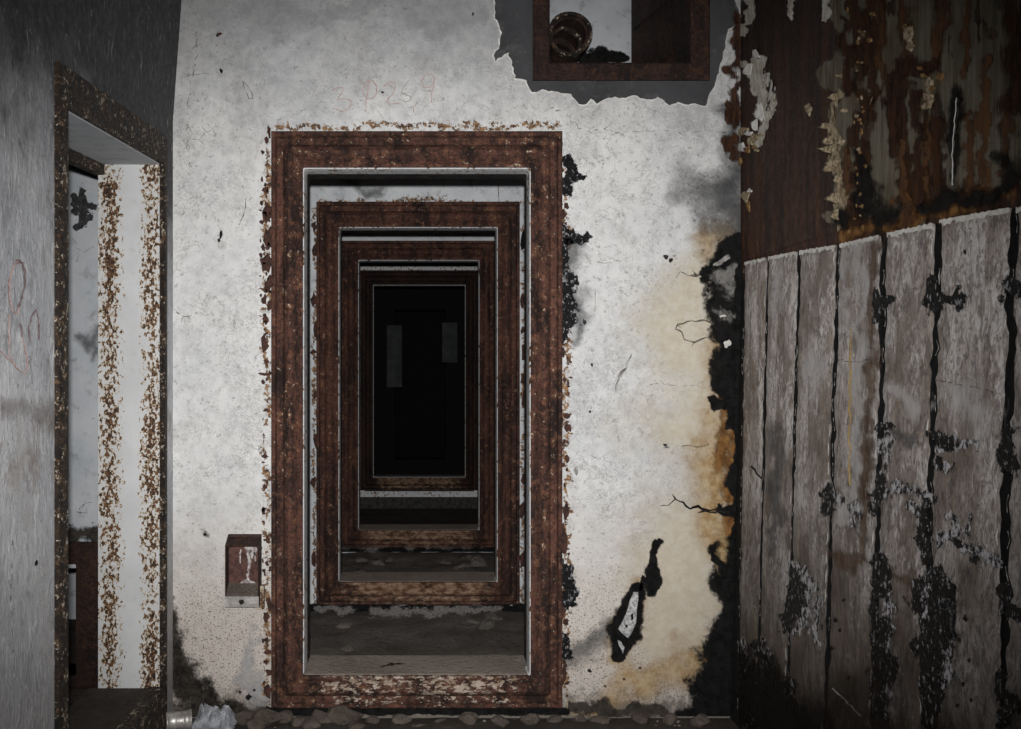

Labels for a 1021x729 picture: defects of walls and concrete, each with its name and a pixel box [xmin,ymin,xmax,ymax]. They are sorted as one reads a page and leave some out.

flaking render [492,0,755,107]
corrosion [274,119,560,131]
peeling [738,0,1021,266]
crack [675,319,712,346]
damp [921,273,967,316]
corrosion [258,271,271,696]
peeling [562,501,570,556]
corrosion [562,329,574,565]
crack [661,494,729,514]
damp [710,258,799,729]
damp [818,243,958,729]
damp [996,424,1021,479]